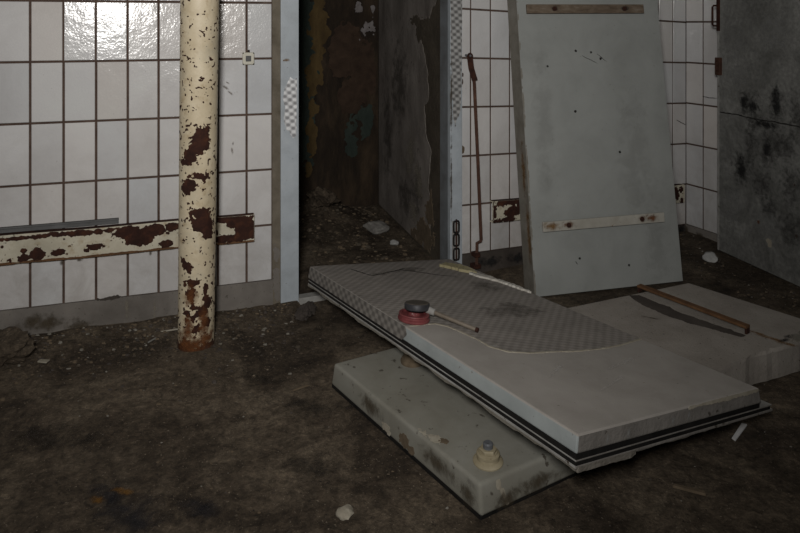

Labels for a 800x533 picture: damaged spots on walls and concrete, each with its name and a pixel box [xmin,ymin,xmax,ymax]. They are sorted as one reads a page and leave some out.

corrosion [0,206,254,266]
corrosion [179,124,211,195]
corrosion [177,258,215,352]
spalling [179,0,219,181]
spalling [181,150,217,289]
peeling [299,0,331,178]
flaking render [355,0,437,248]